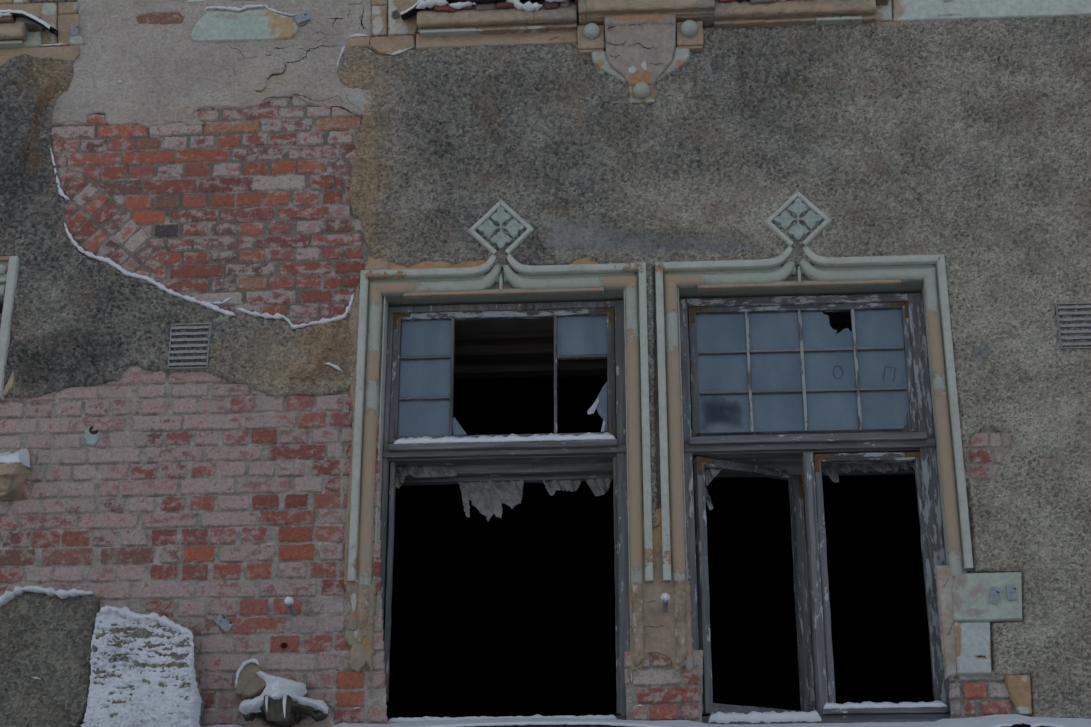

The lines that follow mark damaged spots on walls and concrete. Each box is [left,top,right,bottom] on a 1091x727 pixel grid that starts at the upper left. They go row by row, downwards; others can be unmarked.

flaking render [137,12,184,25]
crack [228,2,413,117]
flaking render [51,97,638,331]
flaking render [0,346,387,727]
peeling [926,307,962,561]
flaking render [948,670,1017,719]